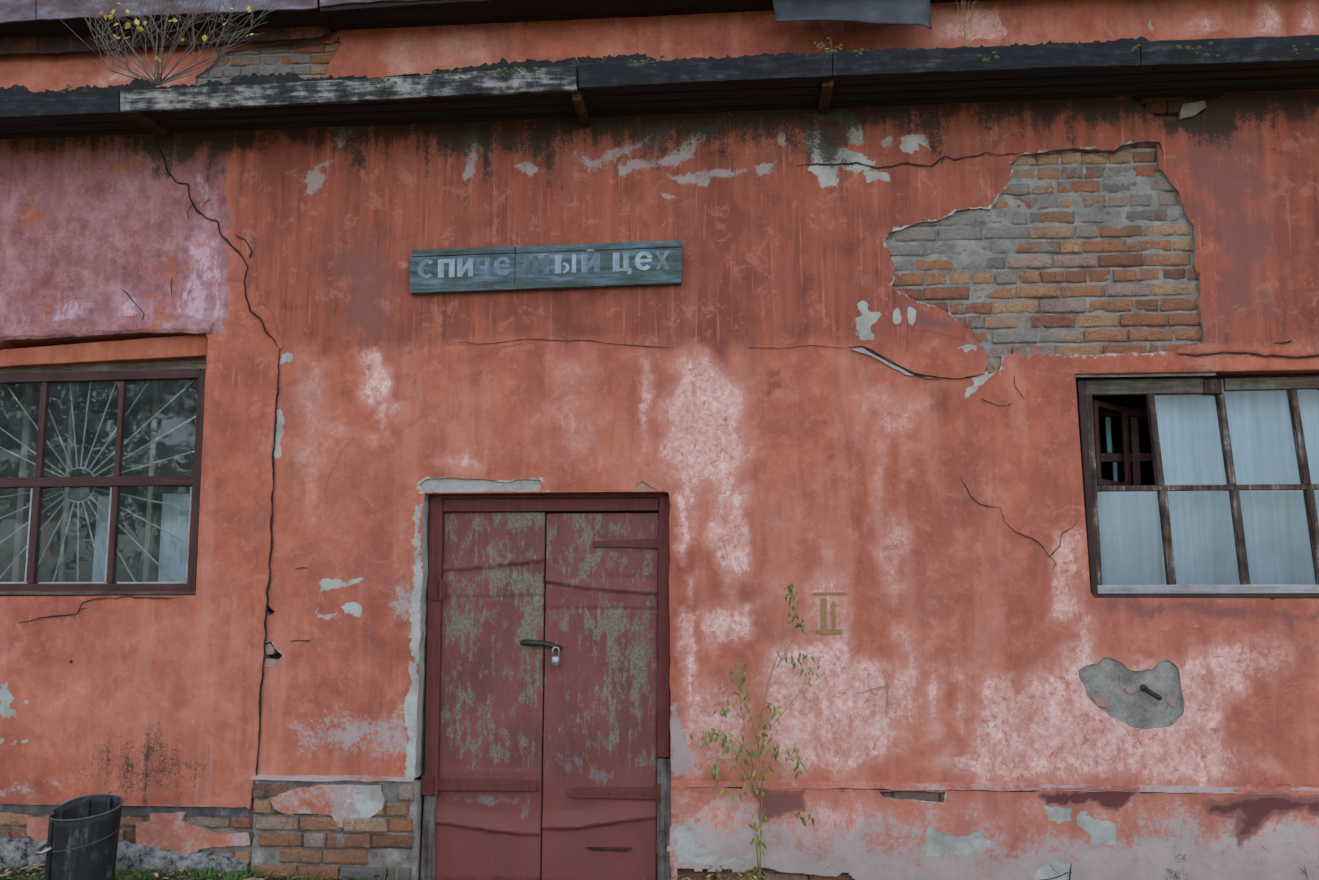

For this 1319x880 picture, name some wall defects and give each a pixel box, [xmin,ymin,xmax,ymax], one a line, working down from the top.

damp [0,134,175,185]
peeling [653,107,934,202]
crack [795,142,1164,169]
spalling [851,142,1202,402]
crack [1178,340,1319,358]
crack [157,137,310,809]
damp [168,91,1319,880]
crack [960,477,1078,569]
damp [6,597,104,652]
spalling [119,478,541,880]
spalling [1079,658,1183,729]
damp [121,724,167,785]